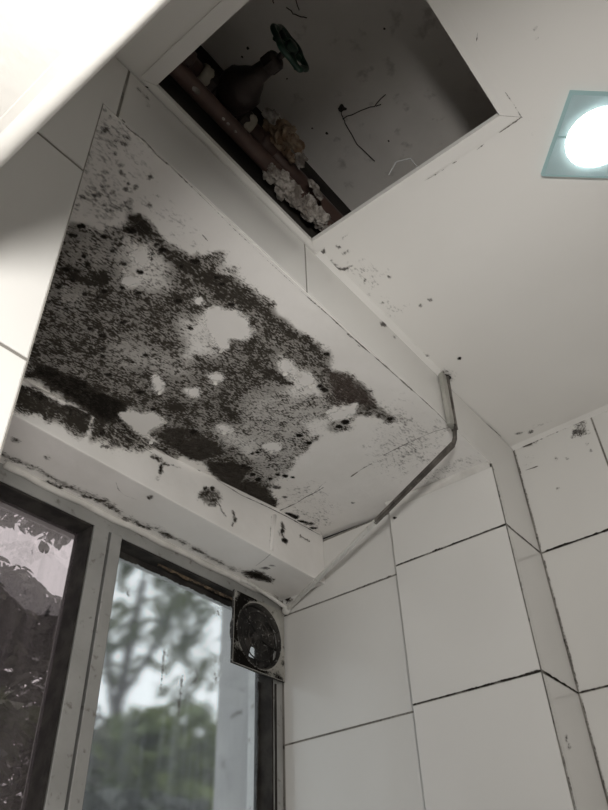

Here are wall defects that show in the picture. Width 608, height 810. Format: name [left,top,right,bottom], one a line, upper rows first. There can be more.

water stain [15,157,398,526]
water stain [1,453,223,564]
water stain [232,565,275,583]
water stain [280,513,325,543]